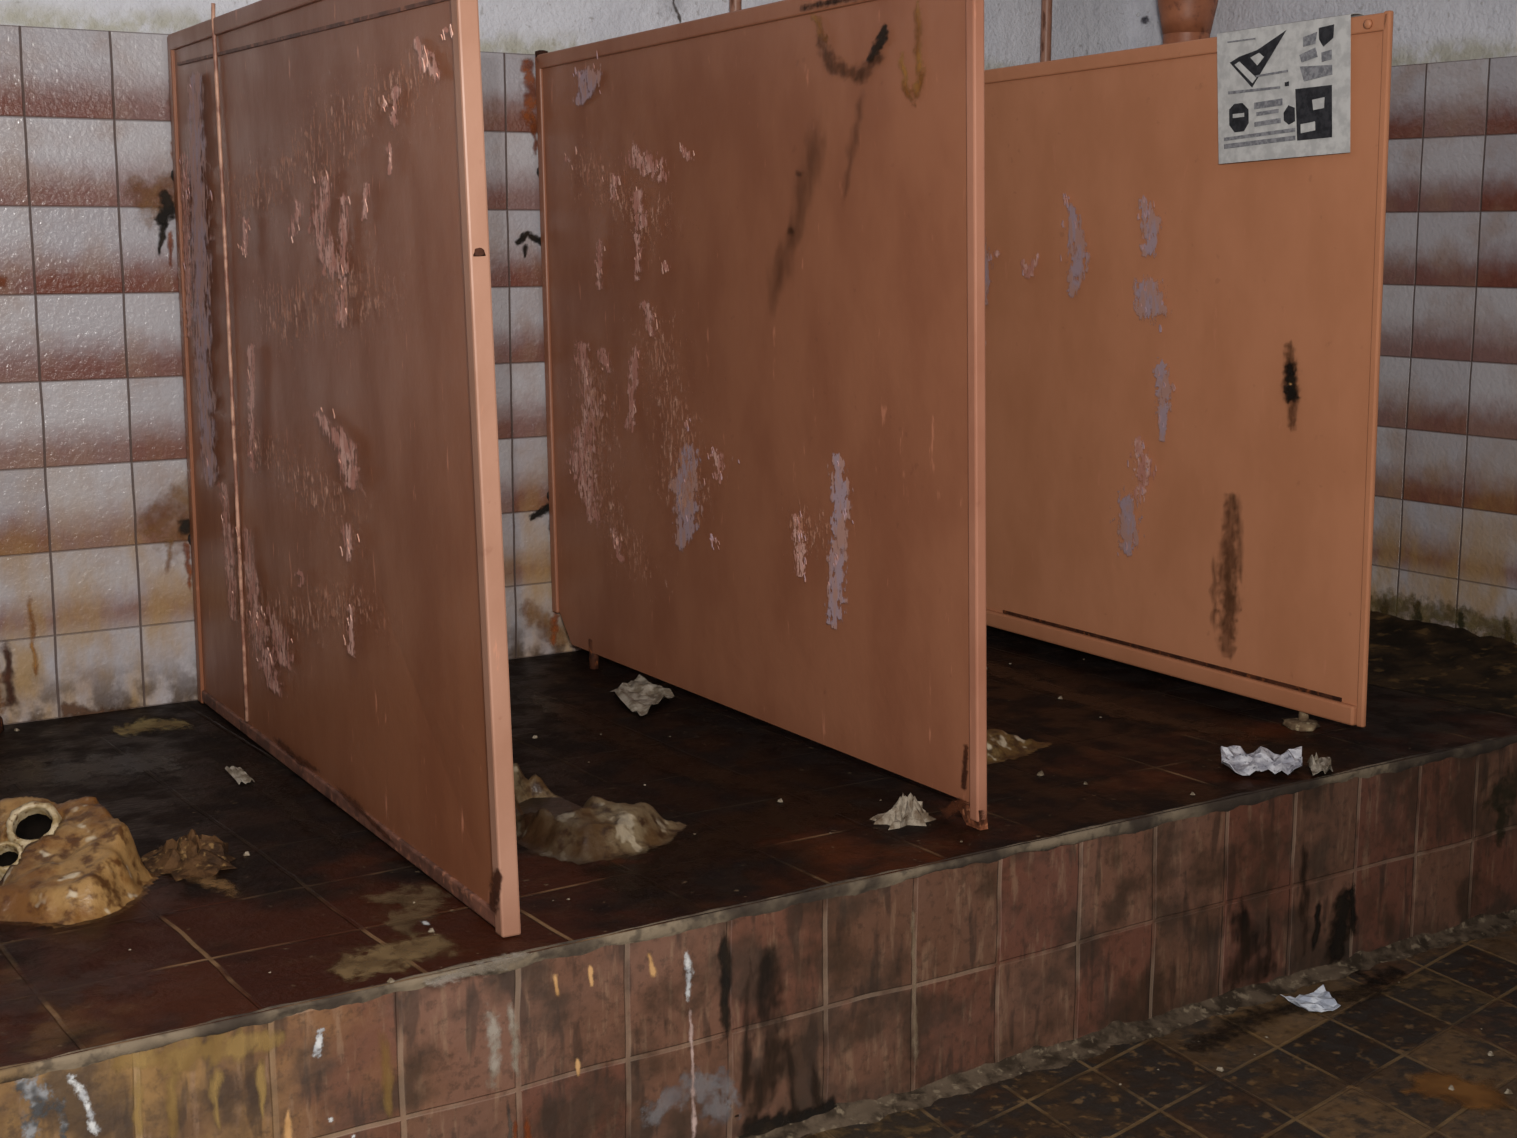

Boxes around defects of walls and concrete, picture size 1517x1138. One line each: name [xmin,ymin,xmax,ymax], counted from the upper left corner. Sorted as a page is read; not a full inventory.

peeling [572,51,601,106]
peeling [556,134,699,290]
peeling [1133,195,1168,332]
peeling [179,24,453,698]
peeling [560,298,740,602]
peeling [1110,357,1176,556]
peeling [777,452,854,629]
damp [1370,594,1517,643]
damp [0,753,181,791]
damp [236,763,340,844]
damp [1300,851,1321,949]
damp [718,936,751,1096]